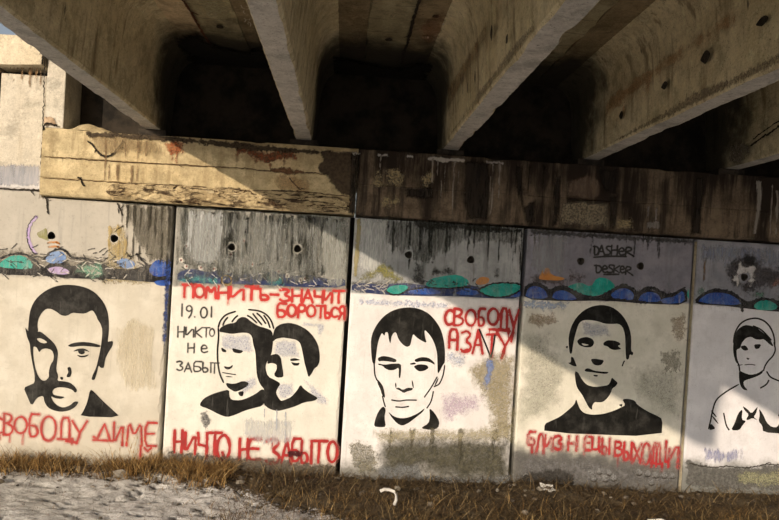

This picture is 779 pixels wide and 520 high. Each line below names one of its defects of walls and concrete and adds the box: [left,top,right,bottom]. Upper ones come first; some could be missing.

rust [164,141,183,163]
rust [236,149,304,175]
crack [750,121,779,147]
water stain [86,131,703,286]
water stain [754,180,779,235]
water stain [378,428,672,486]